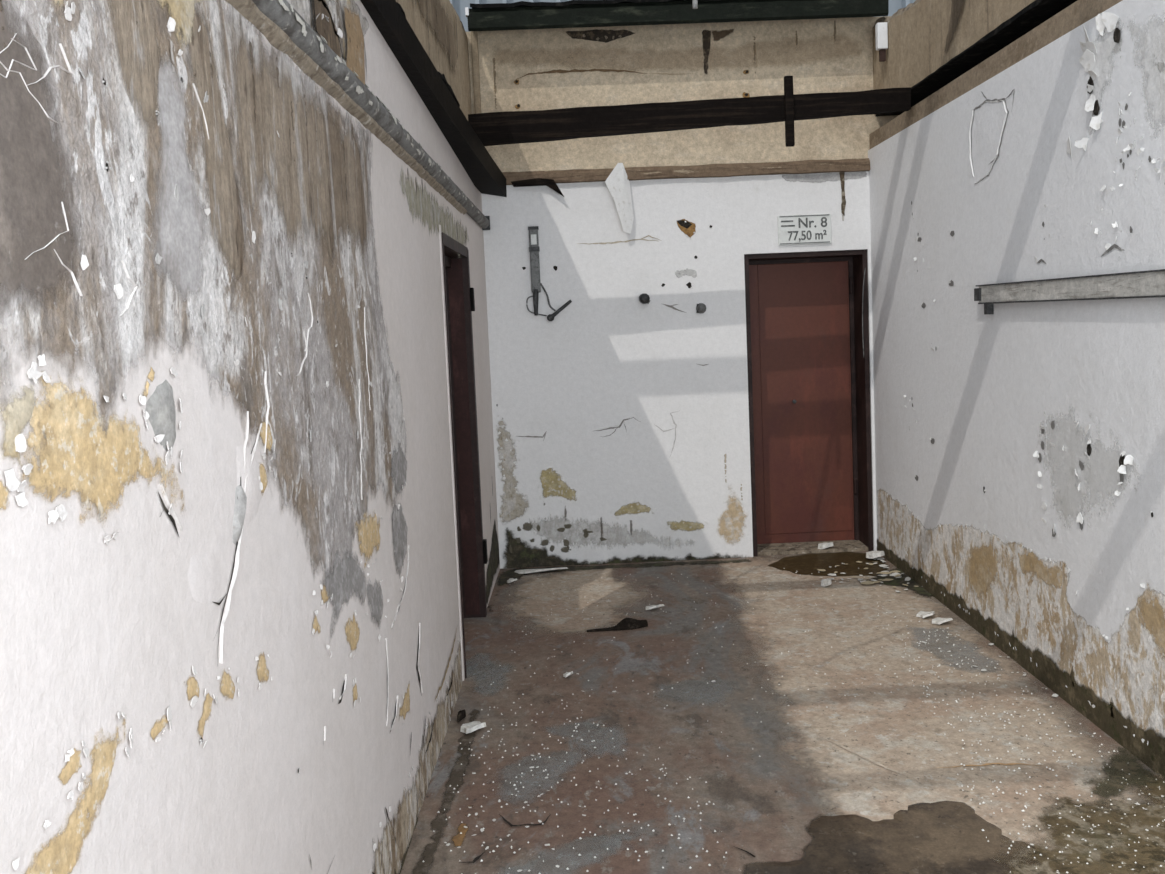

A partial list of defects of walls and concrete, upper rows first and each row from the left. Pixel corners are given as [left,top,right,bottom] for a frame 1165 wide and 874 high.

crack [312,0,367,80]
peeling [278,0,451,179]
peeling [1067,12,1120,158]
spalling [0,0,407,635]
peeling [535,461,576,503]
peeling [610,500,657,519]
peeling [666,520,709,534]
peeling [1033,410,1138,537]
peeling [877,489,1165,745]
damp [868,539,1165,874]
peeling [12,711,134,874]
damp [395,709,480,874]